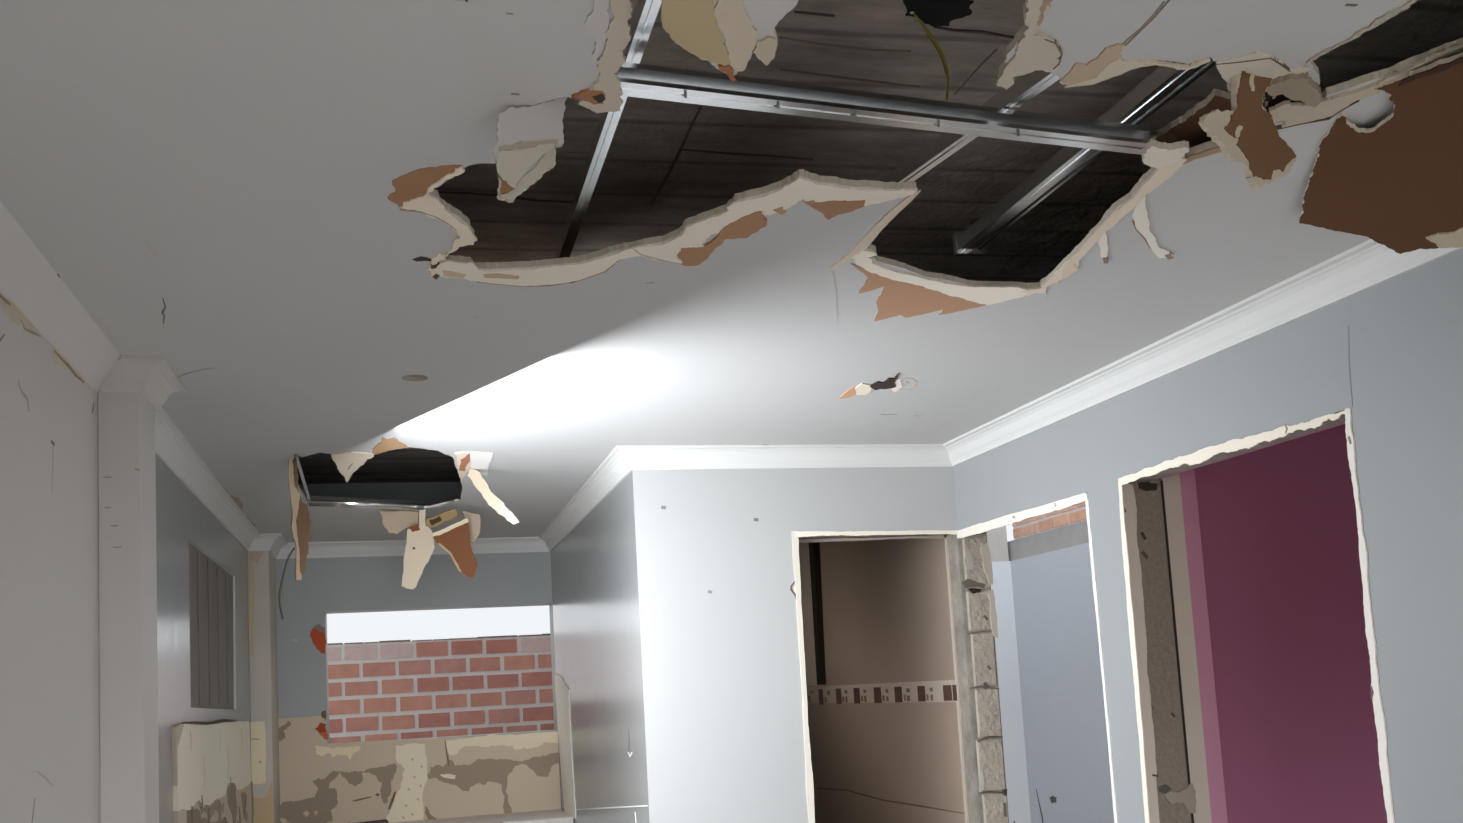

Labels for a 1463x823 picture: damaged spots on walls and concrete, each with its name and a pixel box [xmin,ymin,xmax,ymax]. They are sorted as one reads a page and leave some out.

spalling [579,0,632,114]
spalling [996,0,1061,90]
spalling [1065,0,1463,128]
spalling [401,139,1189,305]
spalling [855,372,902,395]
spalling [331,452,374,482]
peeling [455,451,493,485]
flaking render [315,710,329,740]
spalling [280,753,559,823]